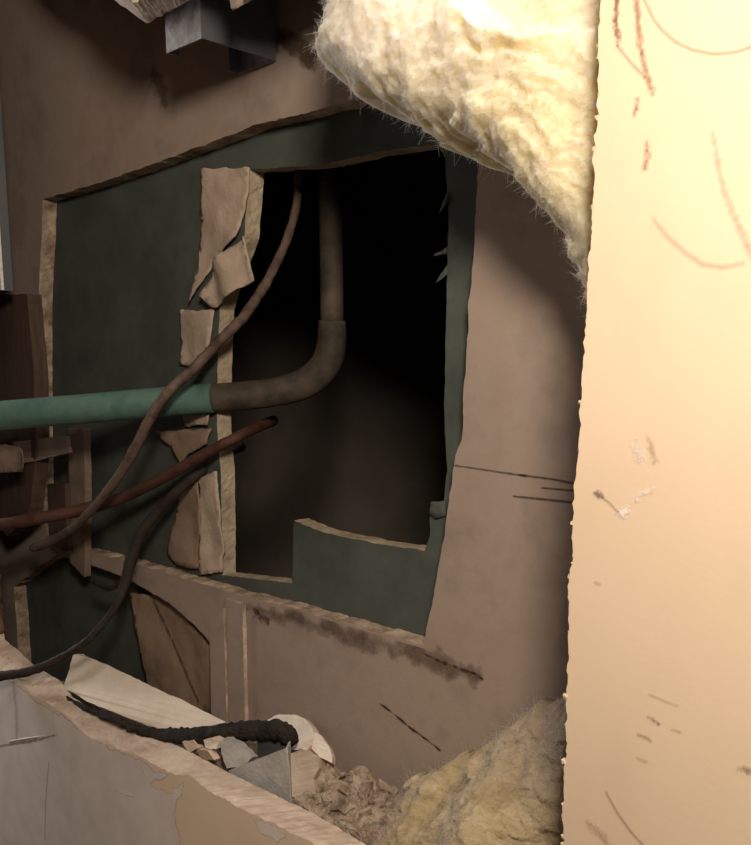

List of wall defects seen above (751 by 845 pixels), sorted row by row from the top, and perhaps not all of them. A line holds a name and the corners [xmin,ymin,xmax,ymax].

peeling [0,680,183,845]
spalling [182,736,258,768]
spalling [268,714,336,798]